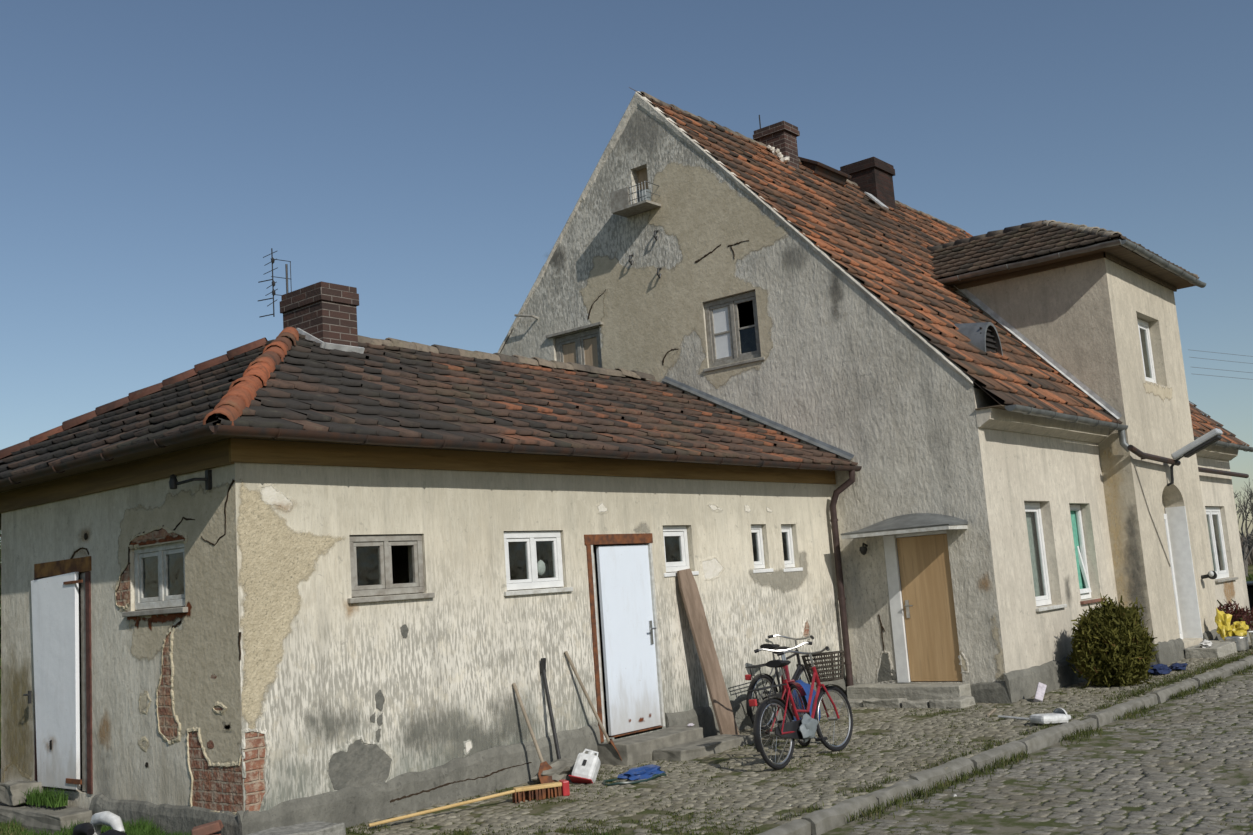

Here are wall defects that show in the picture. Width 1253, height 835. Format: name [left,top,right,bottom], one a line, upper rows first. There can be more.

flaking render [579,162,787,389]
crack [695,240,749,263]
crack [116,479,235,603]
flaking render [115,482,342,815]
flaking render [324,690,393,792]